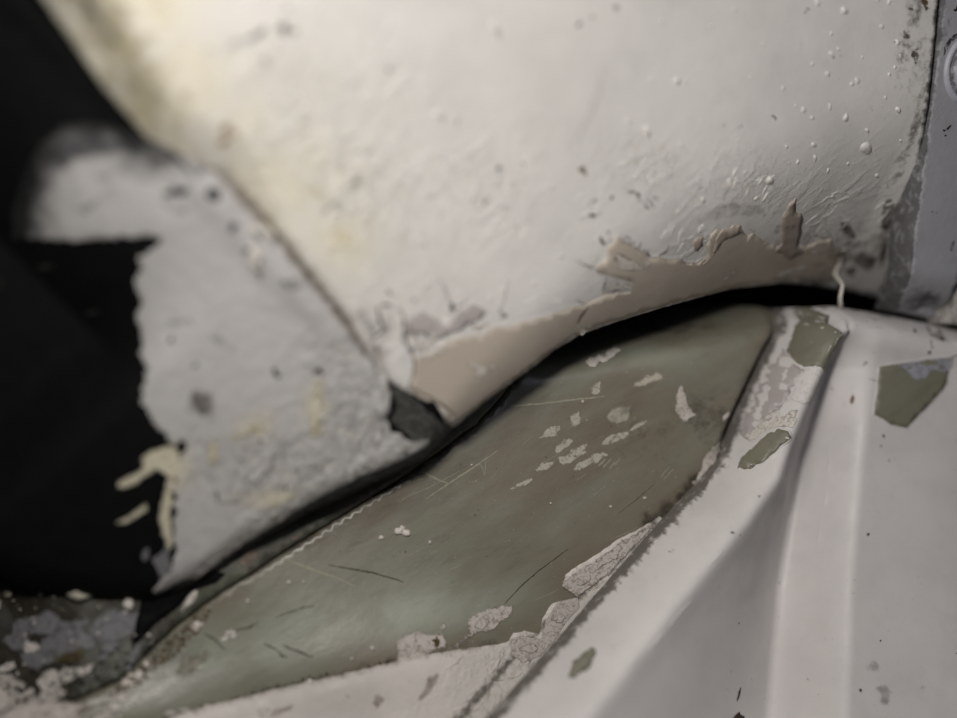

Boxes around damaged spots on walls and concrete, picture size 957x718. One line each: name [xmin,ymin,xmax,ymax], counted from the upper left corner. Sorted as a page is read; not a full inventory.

peeling [400,198,841,426]
peeling [734,307,845,470]
peeling [872,356,951,430]
peeling [116,504,147,524]
peeling [0,630,40,673]
peeling [66,591,91,600]
peeling [95,640,150,718]
peeling [449,604,513,650]